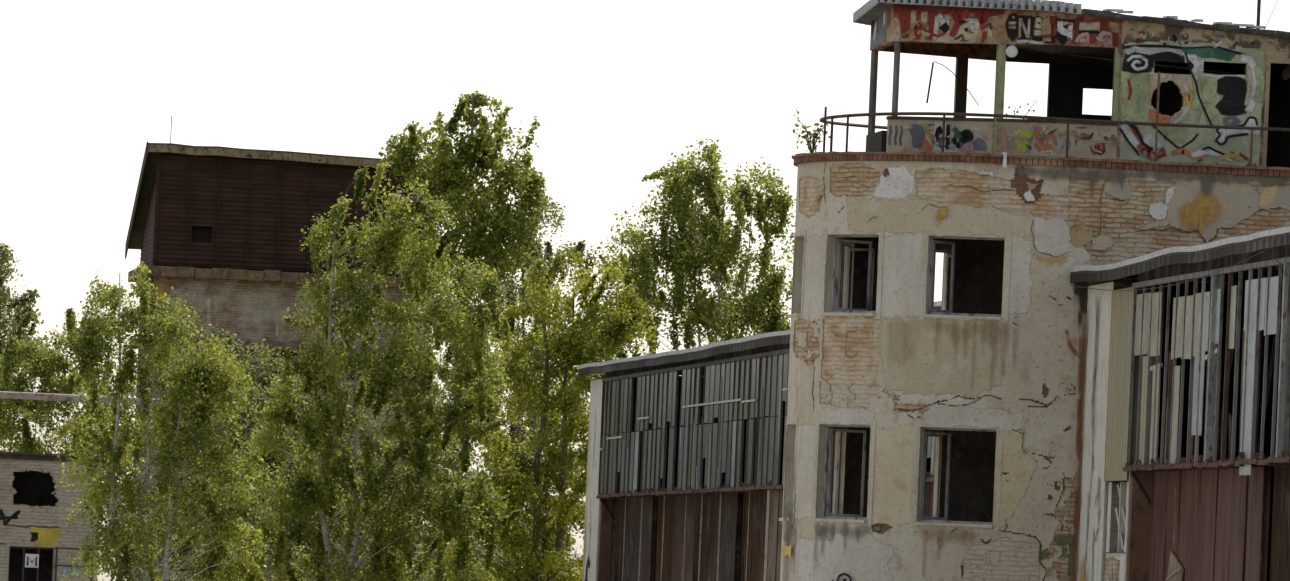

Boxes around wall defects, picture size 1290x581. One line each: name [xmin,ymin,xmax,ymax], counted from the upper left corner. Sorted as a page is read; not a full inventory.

flaking render [800,163,890,217]
flaking render [915,166,1290,265]
flaking render [794,316,881,389]
flaking render [893,393,930,417]
crack [899,336,1114,581]
flaking render [1040,473,1078,581]